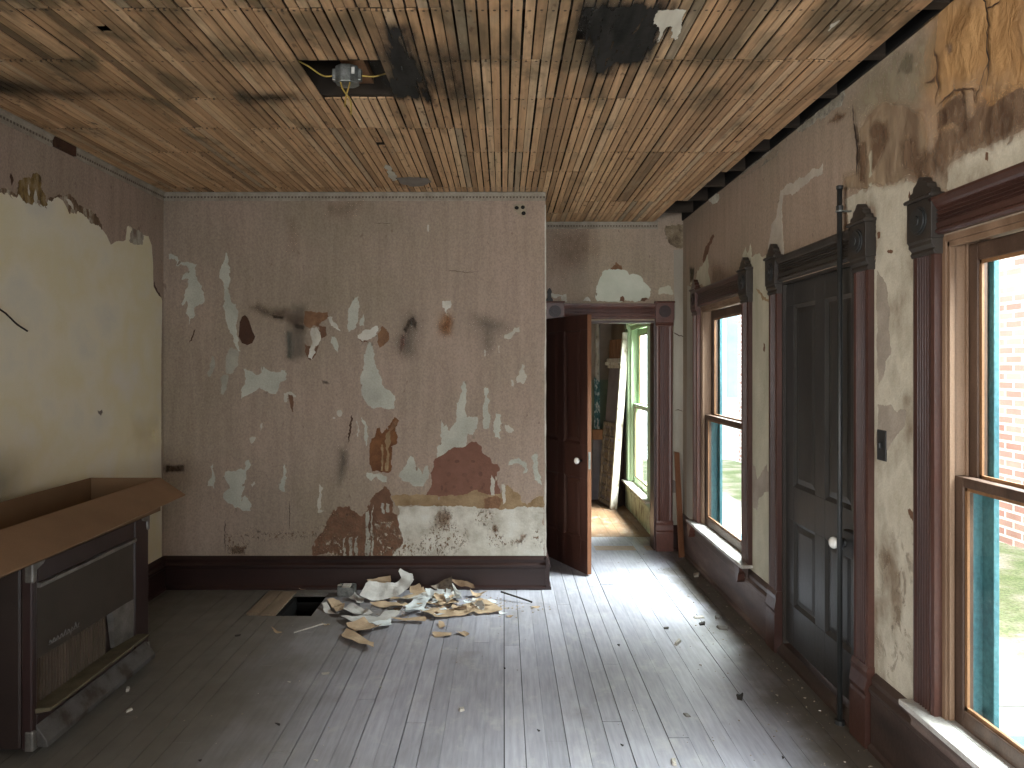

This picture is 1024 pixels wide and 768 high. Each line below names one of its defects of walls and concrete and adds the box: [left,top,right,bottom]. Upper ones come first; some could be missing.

flaking render [947,129,1024,191]
flaking render [0,173,162,502]
peeling [169,254,205,324]
peeling [219,253,296,412]
flaking render [303,205,567,556]
flaking render [583,224,714,525]
flaking render [742,164,823,584]
flaking render [148,506,162,564]
peeling [208,460,255,512]
leakage [475,510,541,545]